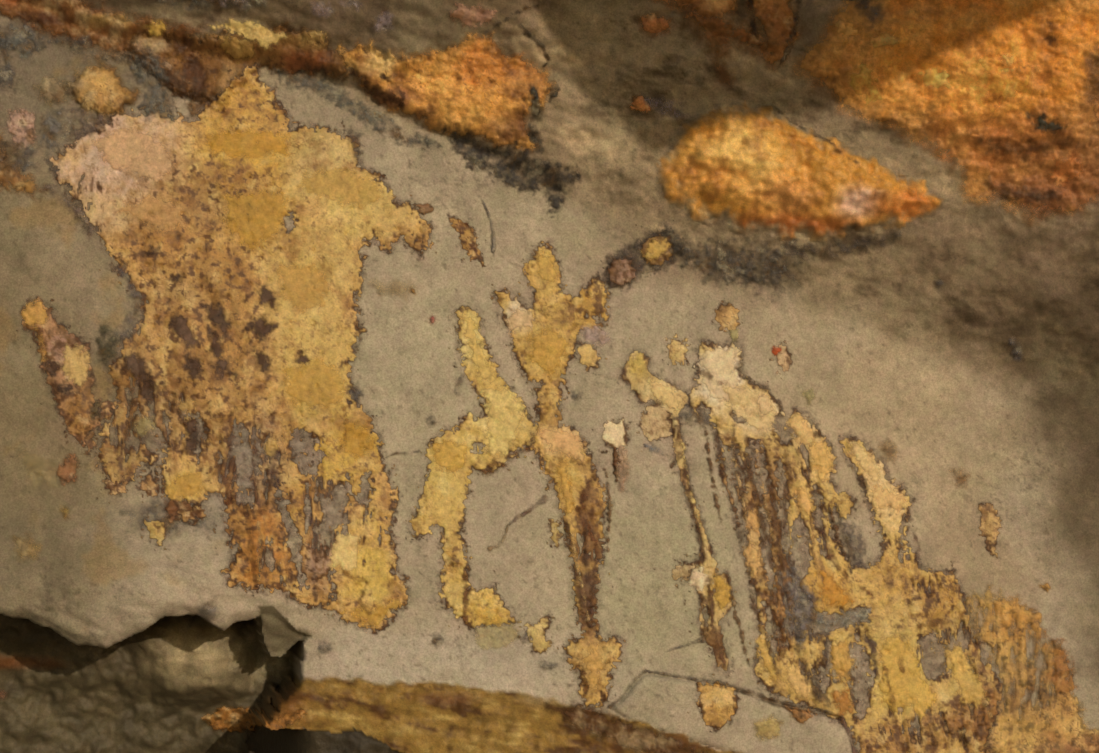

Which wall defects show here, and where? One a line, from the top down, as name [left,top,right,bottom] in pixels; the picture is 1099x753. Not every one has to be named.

rust [0,0,552,149]
leakage [277,70,581,211]
rust [659,0,799,65]
rust [800,0,1099,216]
leakage [448,215,486,267]
leakage [0,53,437,634]
leakage [406,226,1009,753]
peeling [258,607,313,658]
crack [636,638,858,753]